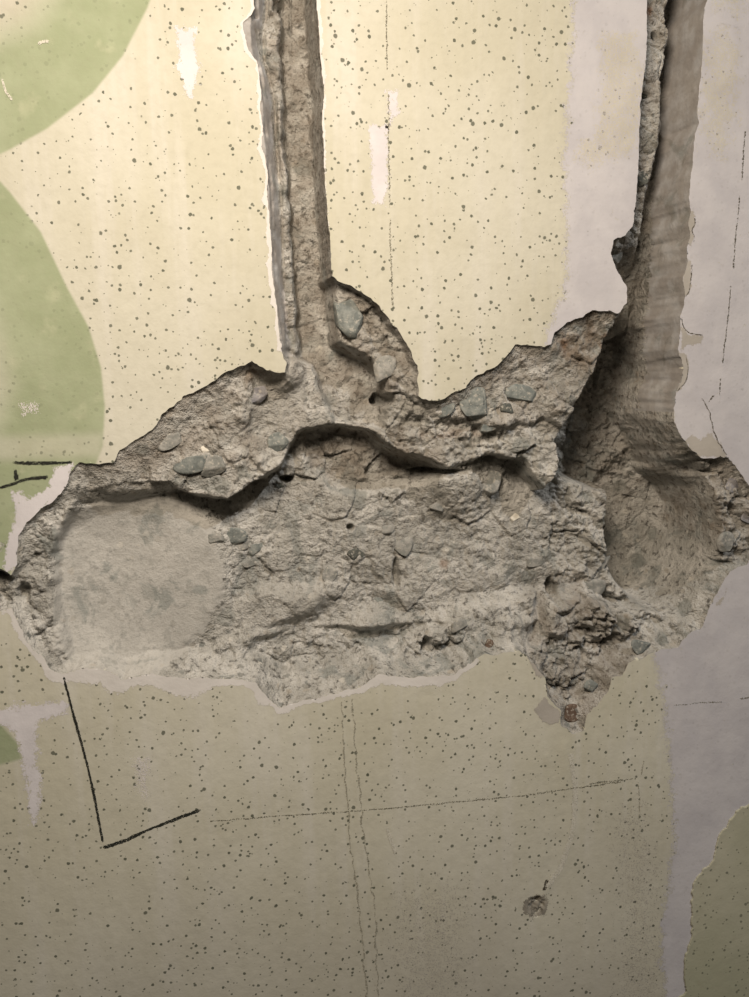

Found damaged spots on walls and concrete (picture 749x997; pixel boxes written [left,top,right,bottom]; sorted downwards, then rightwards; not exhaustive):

spalling [0,0,749,734]
peeling [0,700,74,826]
peeling [650,561,749,997]